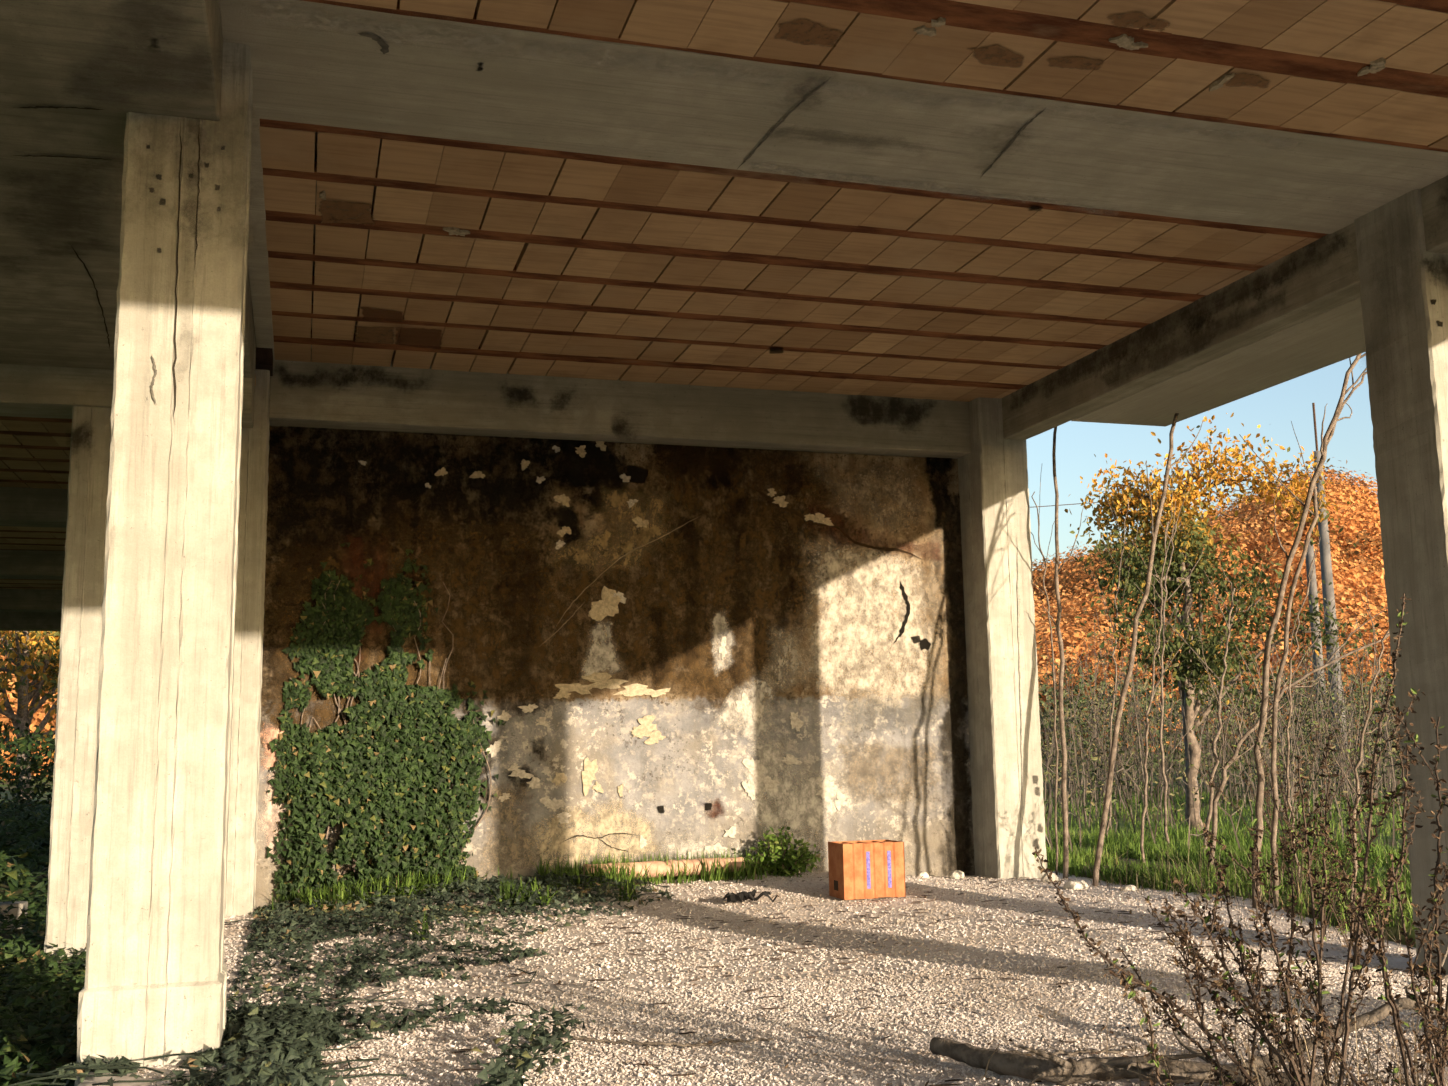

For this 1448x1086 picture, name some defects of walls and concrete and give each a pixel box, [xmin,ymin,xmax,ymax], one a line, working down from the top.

spalling [775,19,844,47]
crack [150,123,200,423]
leakage [1011,236,1337,409]
leakage [850,395,930,427]
leakage [655,444,748,490]
leakage [261,421,648,714]
crack [894,582,910,643]
leakage [483,457,974,875]
flaking render [463,672,670,824]
peeling [741,758,780,800]
peeling [816,779,847,811]
peeling [685,826,736,859]